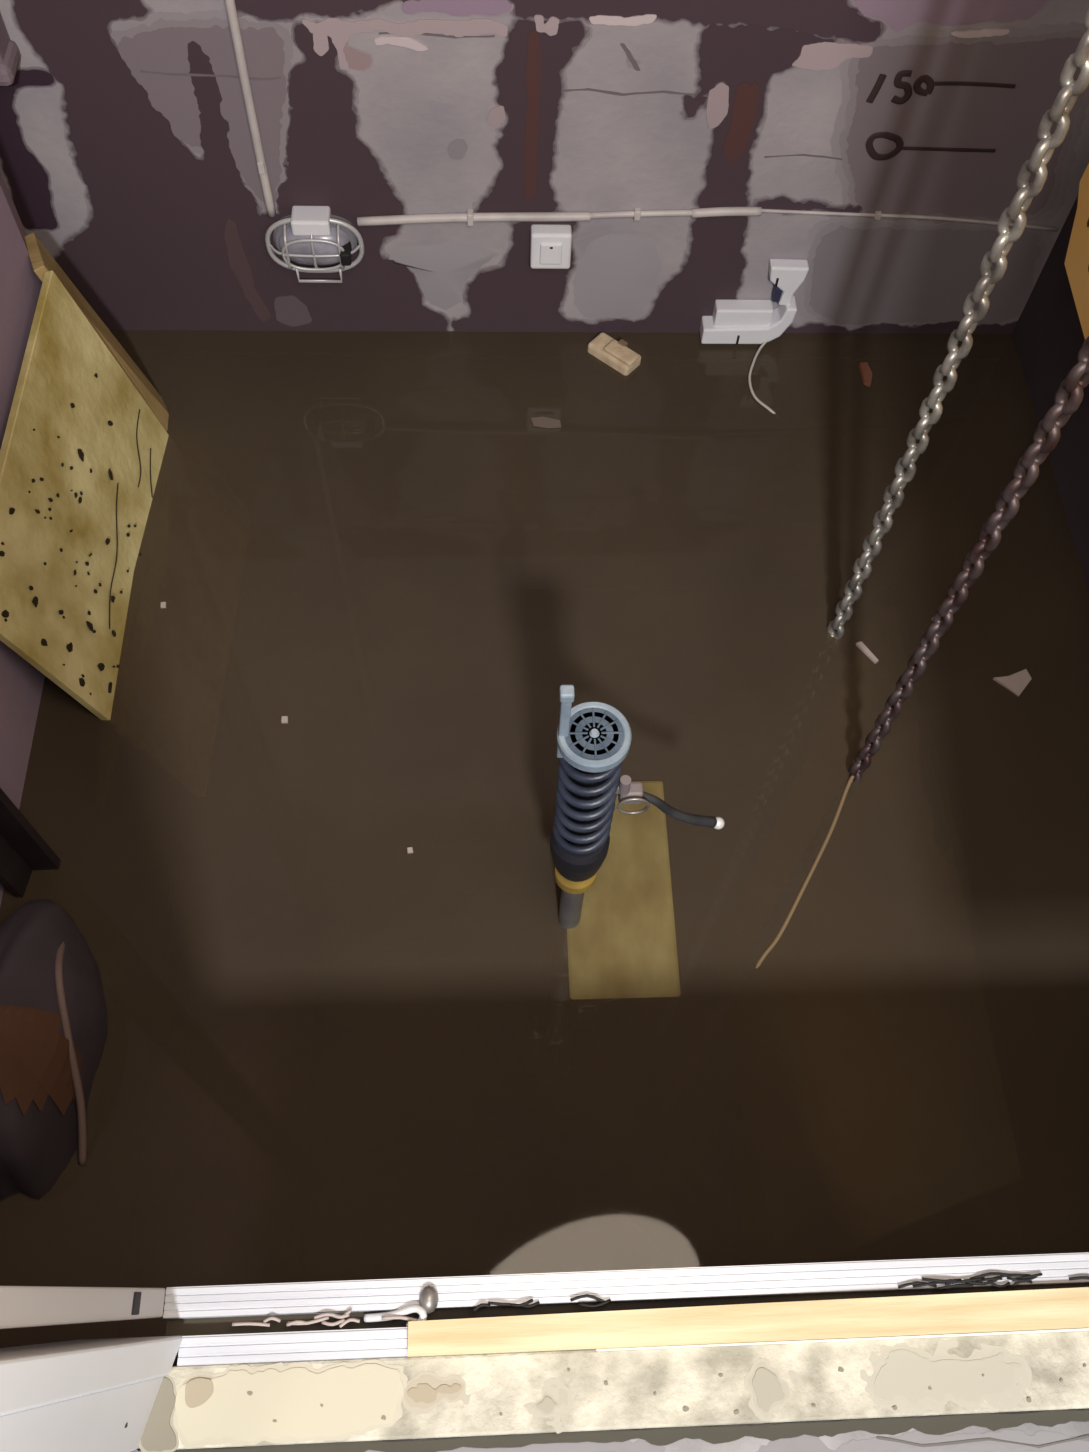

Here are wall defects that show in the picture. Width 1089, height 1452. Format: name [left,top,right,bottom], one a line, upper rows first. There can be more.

peeling [302,0,514,70]
peeling [534,15,559,36]
peeling [589,14,657,26]
peeling [792,41,873,71]
spalling [487,105,505,127]
peeling [706,82,729,129]
spalling [274,295,312,327]